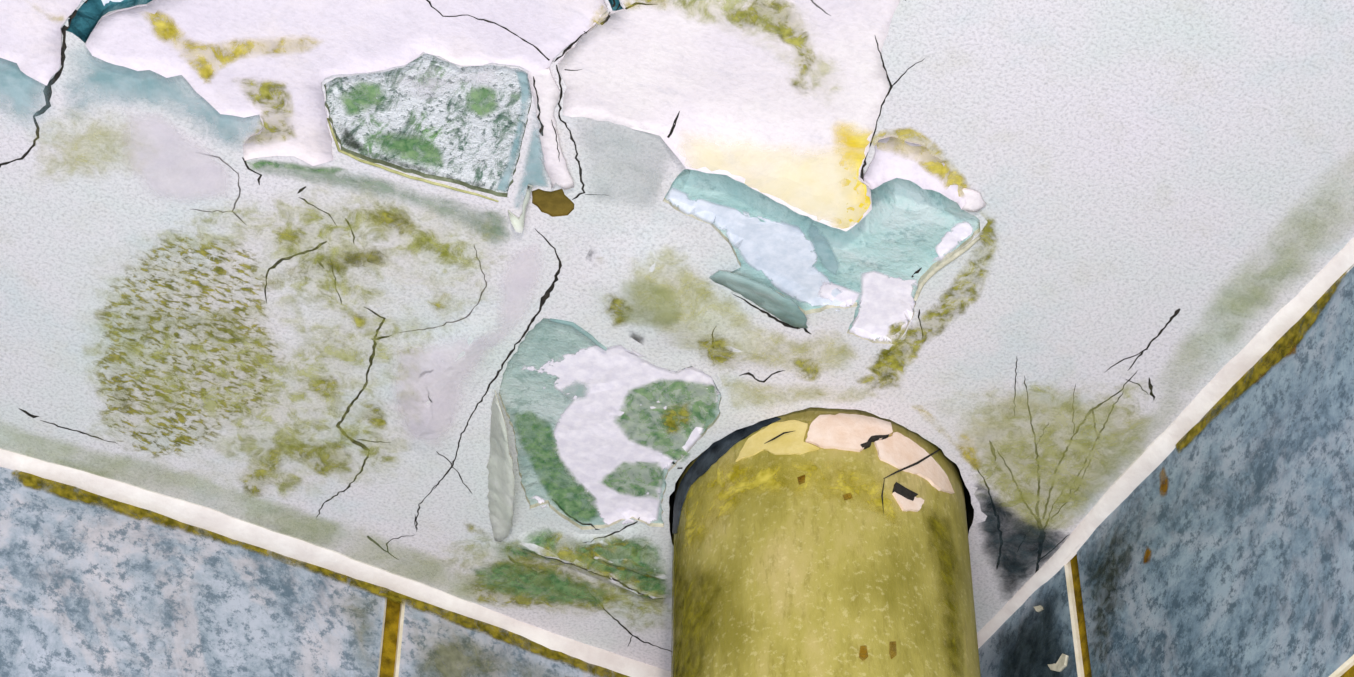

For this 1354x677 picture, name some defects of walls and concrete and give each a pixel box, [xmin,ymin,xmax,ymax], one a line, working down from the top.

crack [0,0,88,167]
peeling [0,0,986,345]
crack [426,0,655,200]
leakage [98,237,382,495]
leakage [12,470,629,677]
crack [264,186,487,518]
crack [367,229,562,559]
spalling [487,318,721,546]
leakage [1002,598,1063,677]
leakage [964,406,1140,591]
crack [977,308,1180,573]
leakage [1176,272,1346,451]